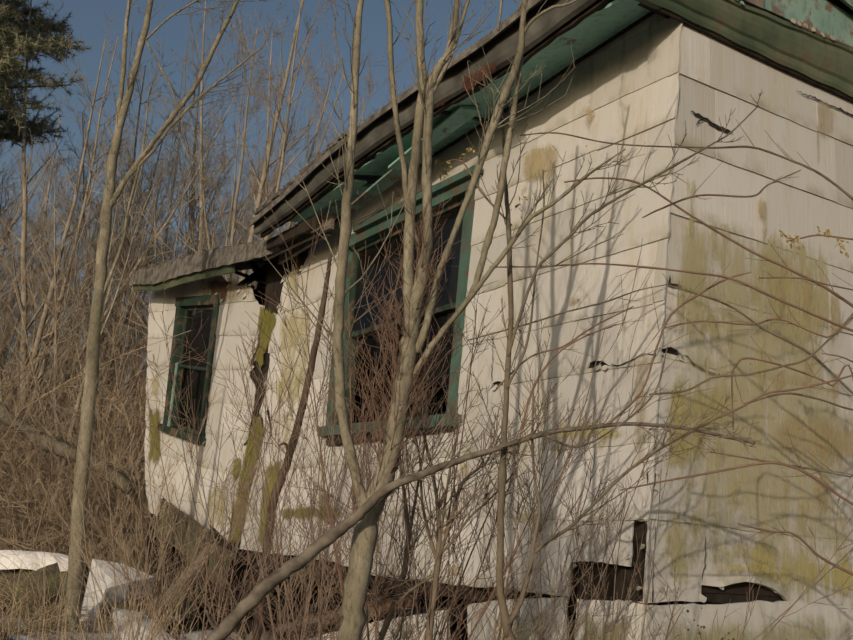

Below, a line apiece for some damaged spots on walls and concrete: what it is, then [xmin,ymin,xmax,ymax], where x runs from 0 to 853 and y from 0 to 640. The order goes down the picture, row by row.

crack [691,111,731,133]
crack [796,90,853,116]
damp [524,147,555,185]
damp [750,235,840,347]